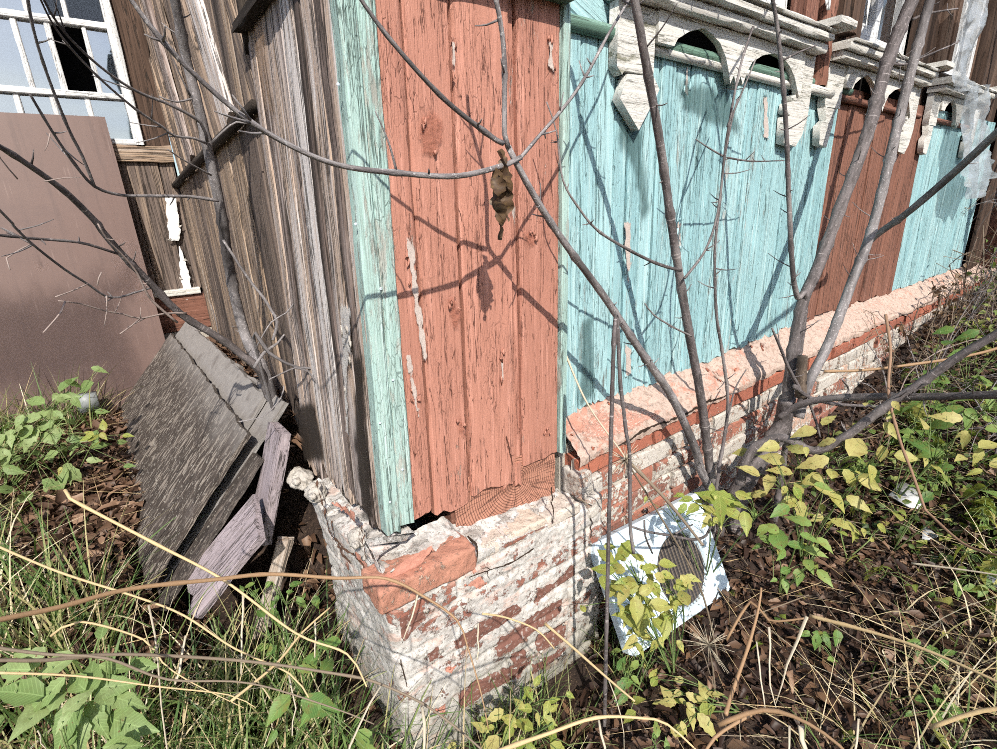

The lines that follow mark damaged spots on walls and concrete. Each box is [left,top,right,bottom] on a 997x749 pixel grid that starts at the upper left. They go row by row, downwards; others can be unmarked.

peeling [406,238,427,360]
flaking render [873,334,896,363]
peeling [406,355,420,416]
flaking render [808,378,845,427]
flaking render [597,399,778,536]
spalling [330,499,356,523]
spalling [384,546,432,577]
spalling [399,608,430,643]
spalling [424,564,575,708]